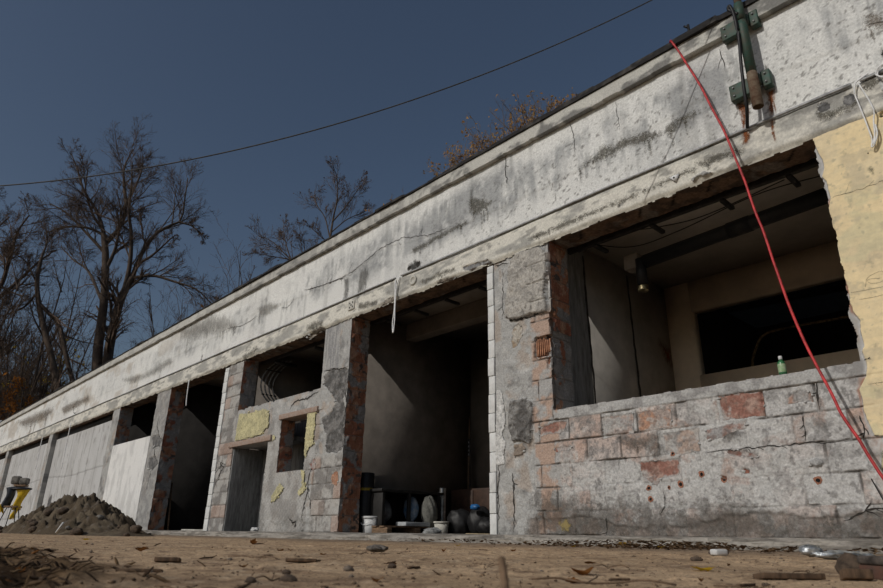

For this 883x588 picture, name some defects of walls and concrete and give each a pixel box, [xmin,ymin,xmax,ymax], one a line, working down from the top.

corrosion [737,103,750,143]
corrosion [767,89,776,140]
flaking render [534,335,552,358]
spalling [304,369,348,458]
spalling [495,390,567,466]
crack [712,383,869,453]